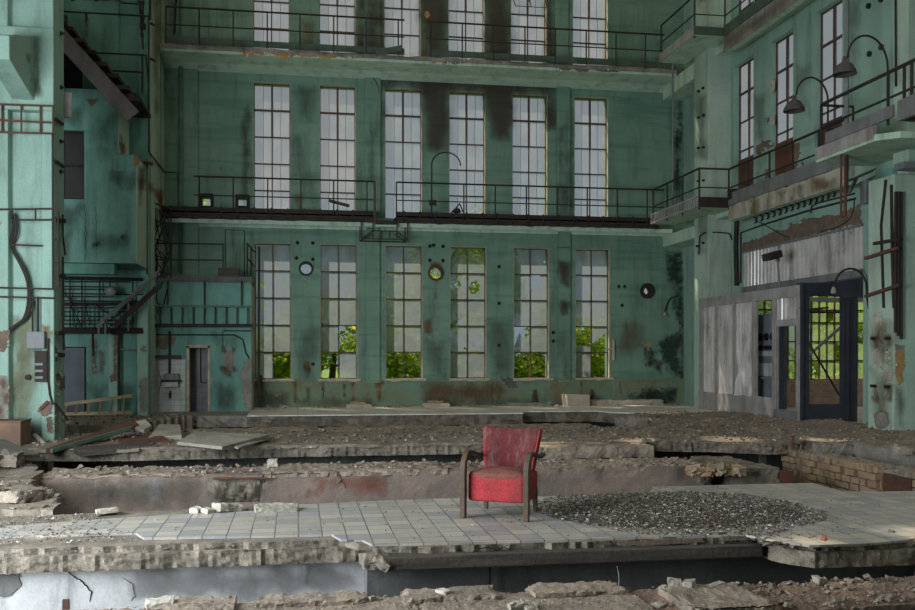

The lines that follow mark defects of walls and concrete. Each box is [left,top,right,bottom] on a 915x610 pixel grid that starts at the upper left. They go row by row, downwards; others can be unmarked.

peeling [37,345,66,435]
peeling [224,349,252,411]
peeling [895,344,905,385]